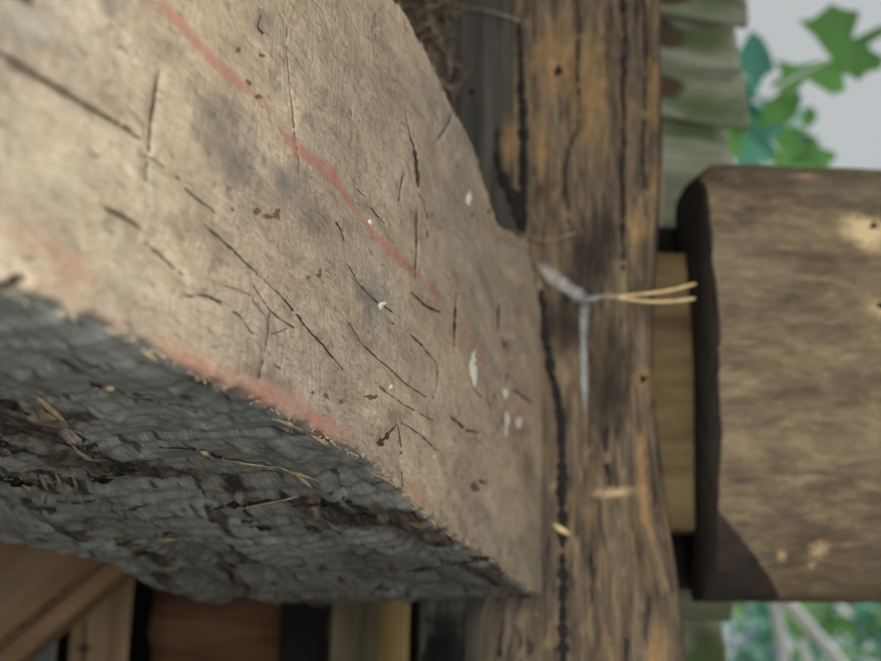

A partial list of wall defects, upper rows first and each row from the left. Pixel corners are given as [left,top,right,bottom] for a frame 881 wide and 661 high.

crack [102,69,343,378]
crack [286,26,300,173]
crack [347,264,480,488]
crack [398,112,457,347]
crack [494,303,502,332]
crack [493,22,529,234]